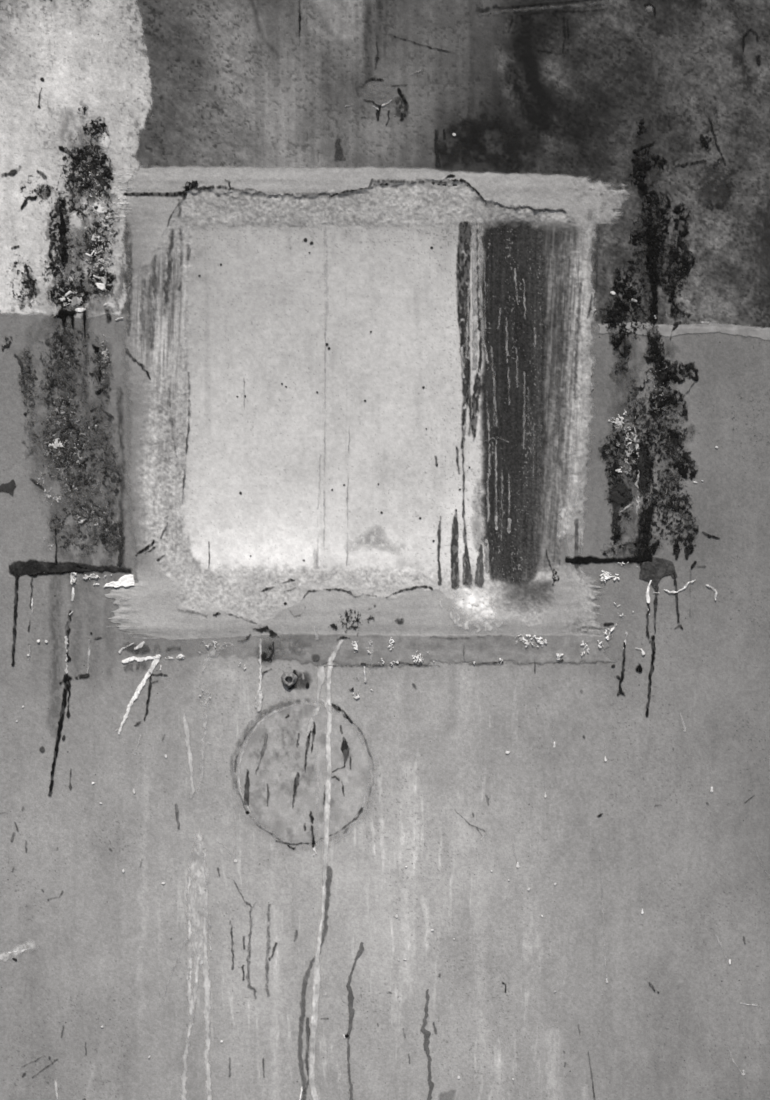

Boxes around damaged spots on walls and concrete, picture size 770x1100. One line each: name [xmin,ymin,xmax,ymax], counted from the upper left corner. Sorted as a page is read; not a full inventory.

water stain [434,114,521,171]
water stain [675,109,733,210]
water stain [437,220,578,632]
water stain [11,574,33,666]
water stain [48,353,125,796]
water stain [616,632,628,696]
water stain [646,580,659,717]
water stain [673,572,683,629]
water stain [298,640,343,1100]
water stain [230,904,277,995]
water stain [343,942,364,1100]
water stain [421,989,437,1100]